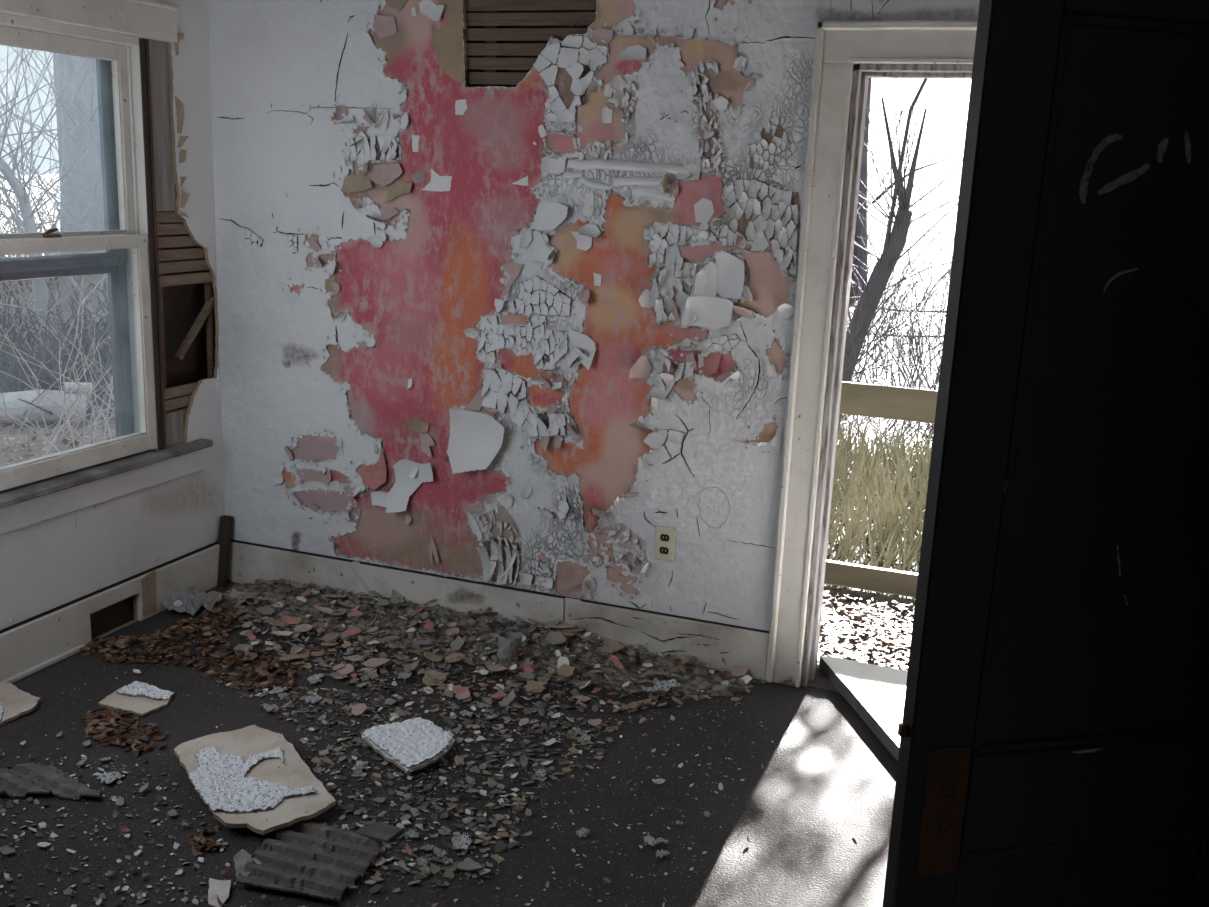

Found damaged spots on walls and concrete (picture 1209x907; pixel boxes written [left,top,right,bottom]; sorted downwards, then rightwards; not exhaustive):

spalling [156,96,220,430]
crack [218,15,399,254]
peeling [274,0,797,599]
crack [533,0,889,324]
crack [656,321,788,478]
crack [563,485,776,655]